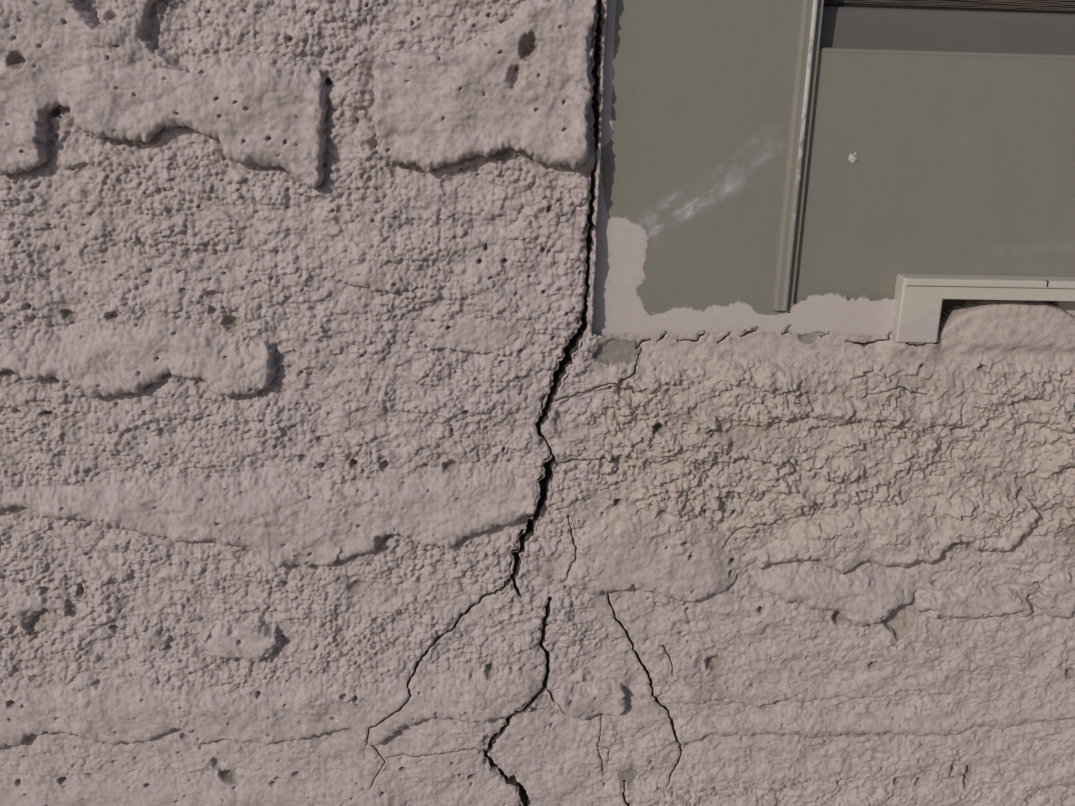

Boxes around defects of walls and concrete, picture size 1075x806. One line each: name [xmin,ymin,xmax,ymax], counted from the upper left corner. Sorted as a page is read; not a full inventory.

peeling [797,331,822,344]
crack [821,330,941,349]
crack [867,383,927,397]
crack [364,0,792,806]